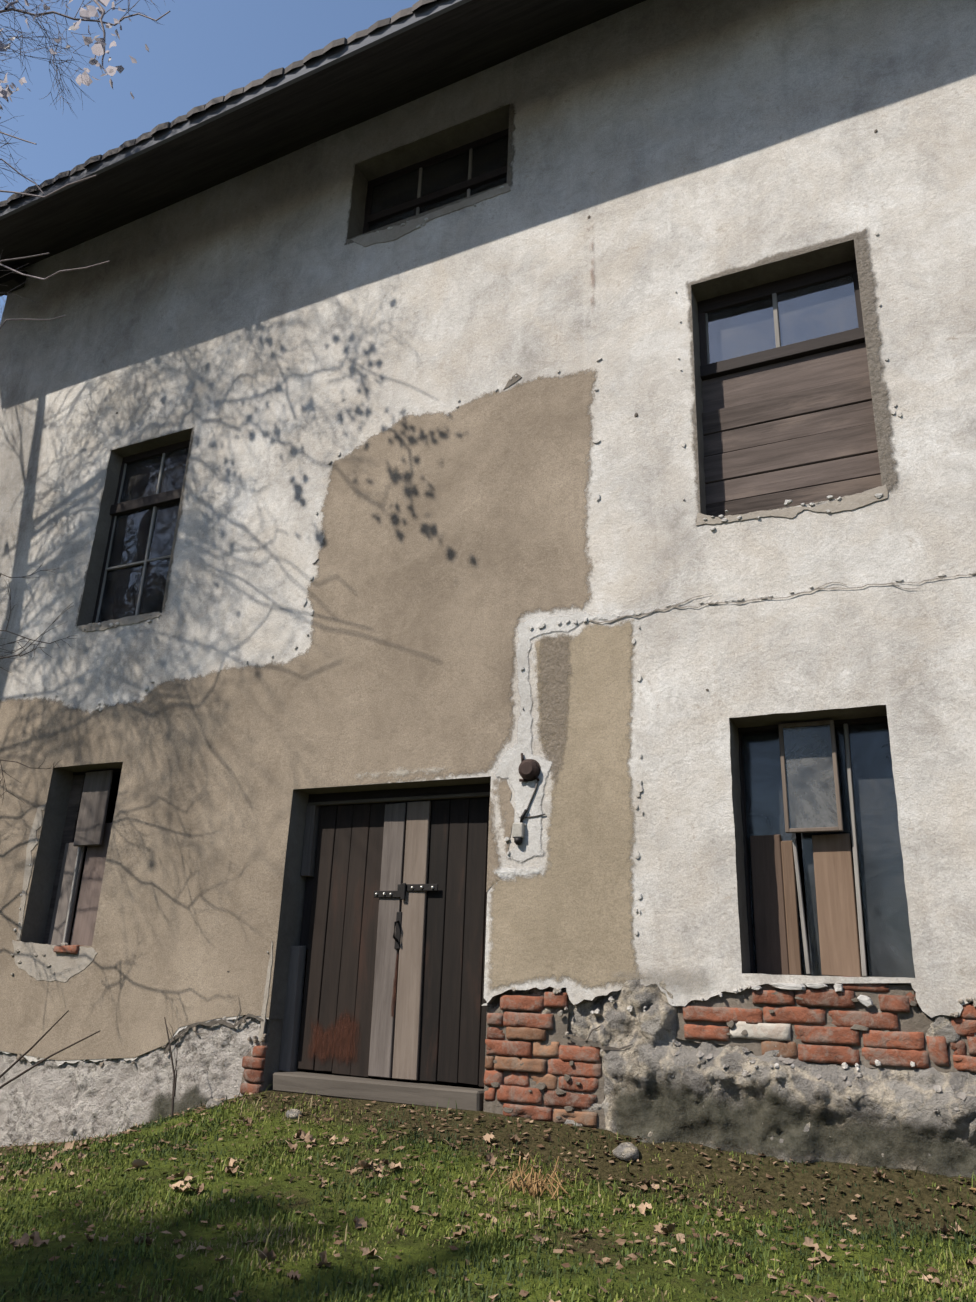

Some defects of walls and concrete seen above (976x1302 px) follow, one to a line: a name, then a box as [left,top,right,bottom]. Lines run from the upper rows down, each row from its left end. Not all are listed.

crack [589,570,976,623]
peeling [0,357,976,1148]
spalling [699,1123,854,1164]
spalling [881,1153,971,1178]